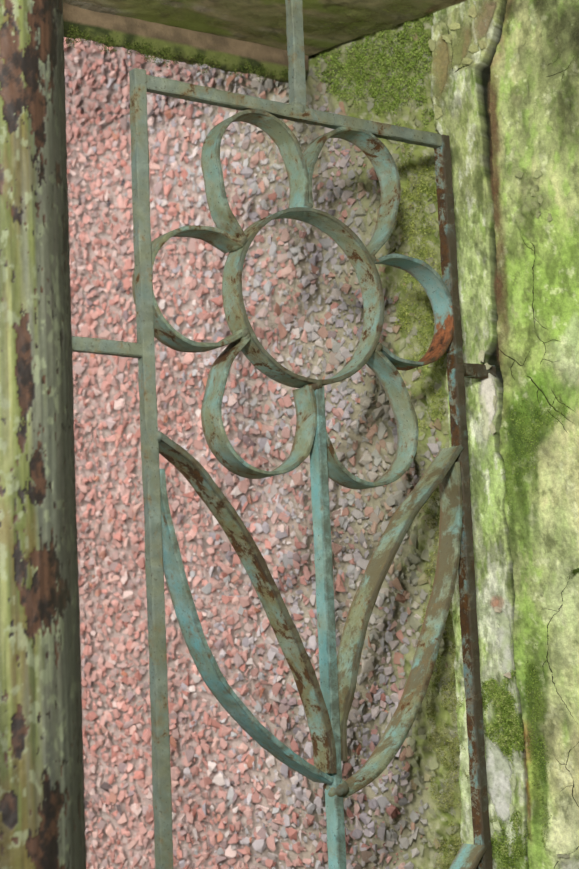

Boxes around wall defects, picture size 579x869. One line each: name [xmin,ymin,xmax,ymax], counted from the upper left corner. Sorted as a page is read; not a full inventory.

spalling [64,37,289,343]
spalling [306,2,496,130]
spalling [147,92,449,680]
crack [500,239,573,435]
spalling [72,352,155,869]
spalling [159,454,314,766]
spalling [164,575,329,869]
spalling [341,500,439,780]
spalling [343,705,461,869]
crack [542,576,573,717]
crack [556,742,579,807]